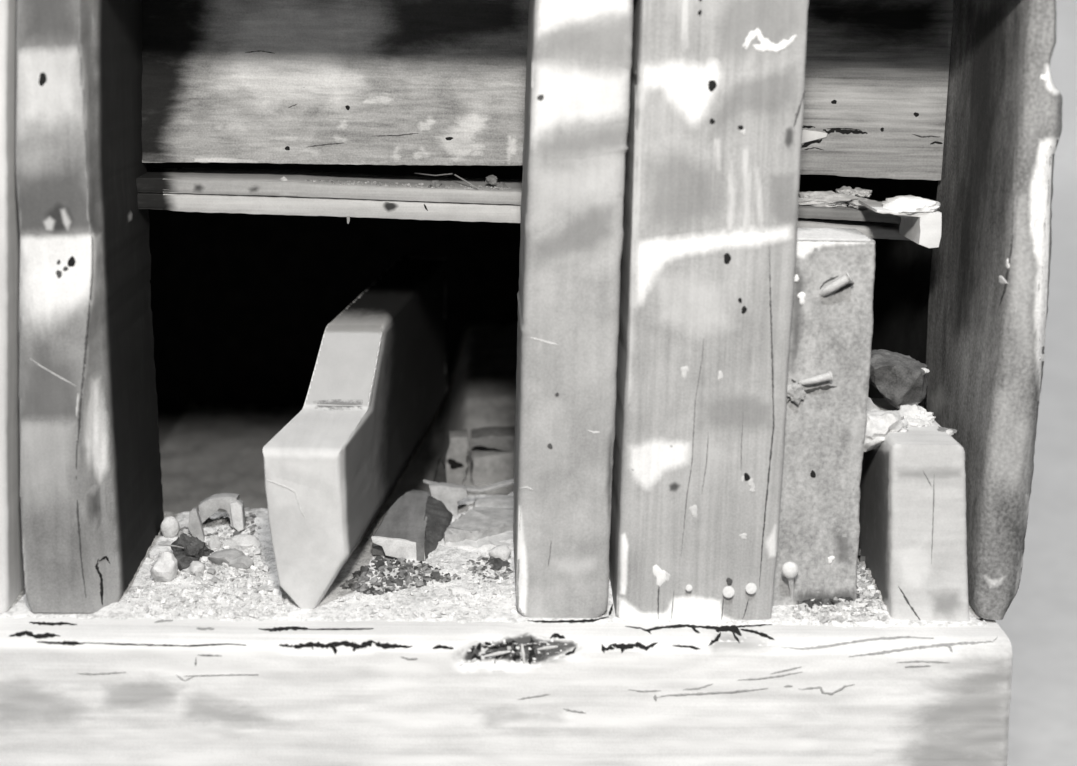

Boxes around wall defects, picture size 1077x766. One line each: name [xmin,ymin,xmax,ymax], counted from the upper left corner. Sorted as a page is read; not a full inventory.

crack [794,91,868,150]
crack [76,277,110,605]
crack [601,244,998,701]
crack [9,620,453,681]